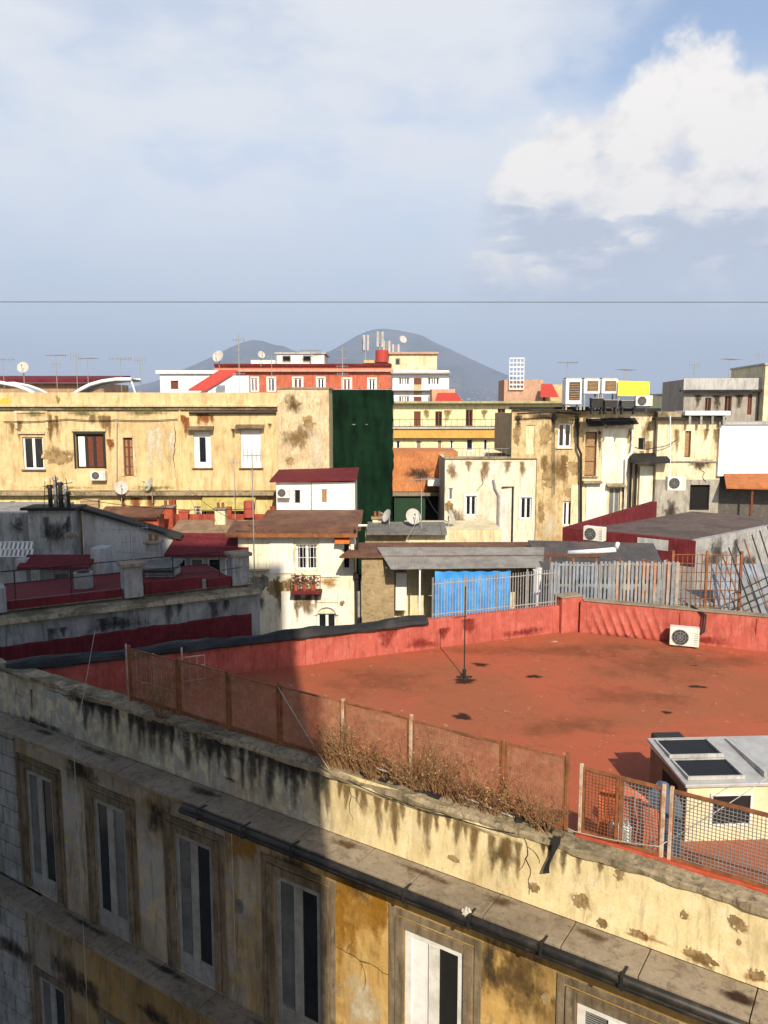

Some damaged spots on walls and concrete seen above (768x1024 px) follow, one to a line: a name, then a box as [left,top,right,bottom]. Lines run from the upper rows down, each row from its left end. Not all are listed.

leakage [285,427,307,446]
leakage [541,455,567,480]
leakage [44,517,70,541]
leakage [68,689,404,843]
leakage [418,809,522,871]
crack [519,839,540,885]
spalling [572,892,589,909]
spalling [727,914,748,946]
crack [336,942,388,990]
leakage [482,944,553,1010]
spalling [683,946,720,967]
spalling [749,968,766,980]